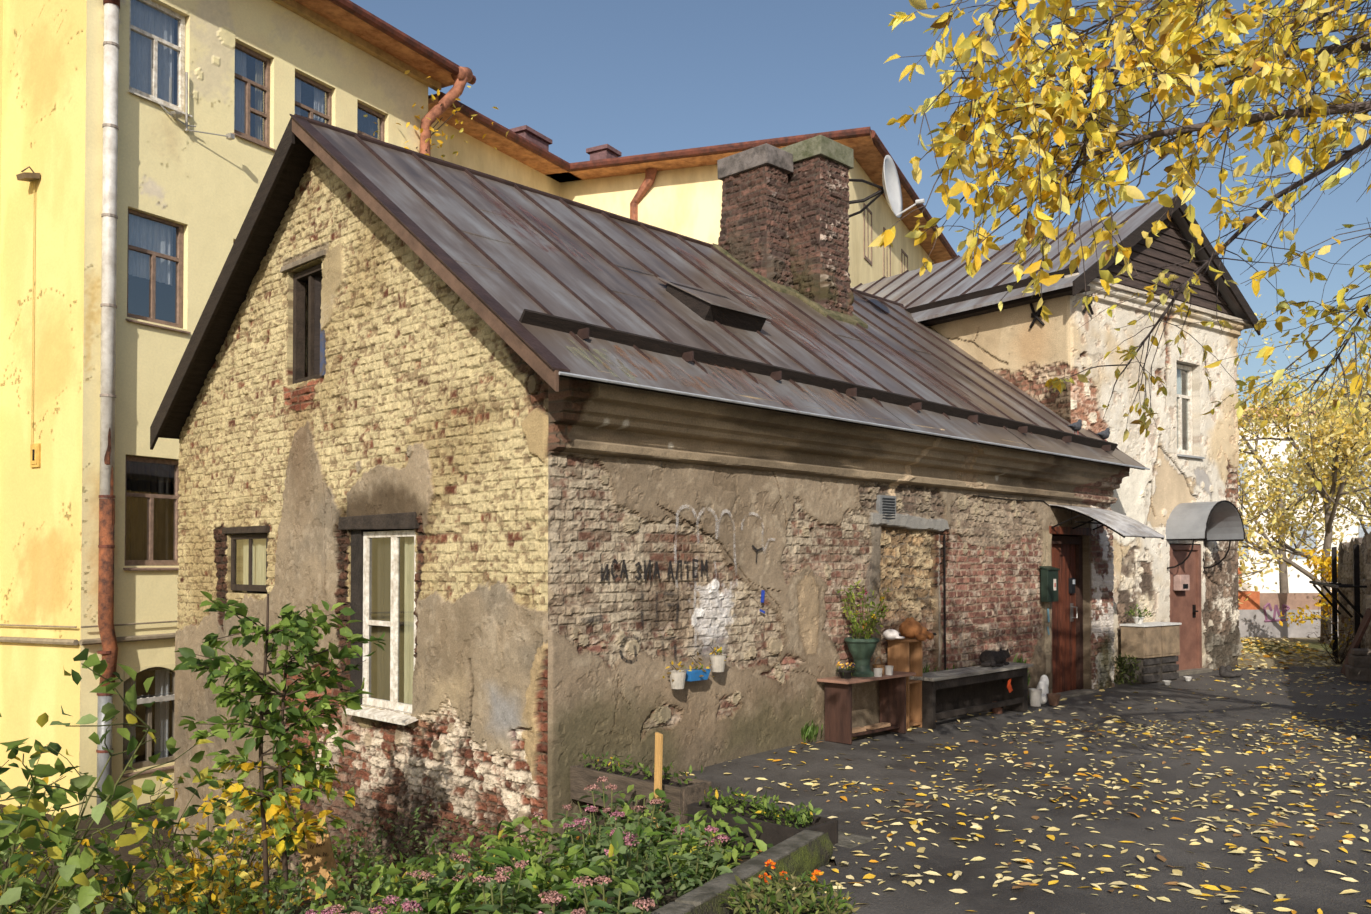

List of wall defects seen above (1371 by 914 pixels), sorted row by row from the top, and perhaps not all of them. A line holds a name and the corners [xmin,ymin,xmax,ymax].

spalling [504,343,549,416]
flaking render [992,351,1108,434]
corrosion [81,427,125,620]
crack [656,502,787,630]
flaking render [936,494,1044,670]
flaking render [1072,453,1156,689]
flaking render [1149,444,1241,527]
flaking render [1201,541,1240,633]
flaking render [272,433,804,889]
crack [750,654,825,697]